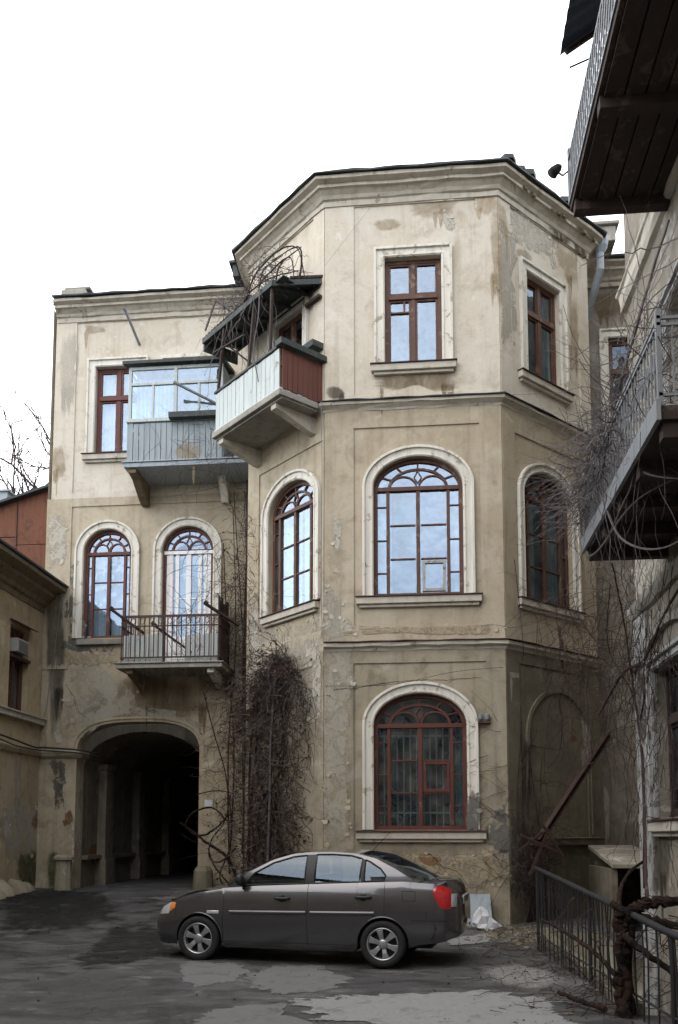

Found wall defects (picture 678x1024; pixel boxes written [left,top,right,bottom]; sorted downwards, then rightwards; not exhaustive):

peeling [509,209,557,269]
peeling [48,516,74,573]
leakage [48,607,206,737]
peeling [304,590,507,721]
peeling [49,758,66,807]